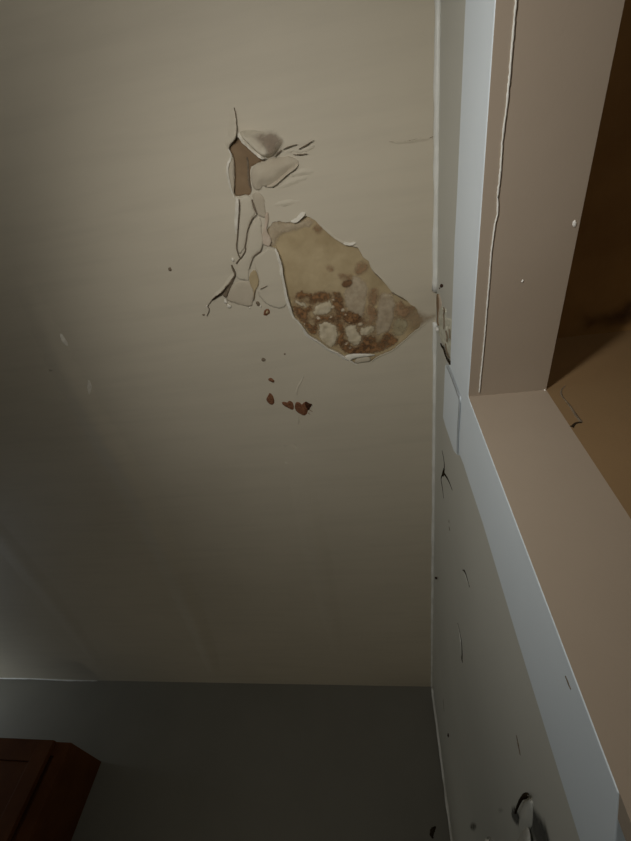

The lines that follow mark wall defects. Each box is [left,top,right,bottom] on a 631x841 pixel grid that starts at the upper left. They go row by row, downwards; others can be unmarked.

spalling [223,108,452,365]
corrosion [266,393,313,415]
crack [441,452,452,498]
peeling [511,792,549,841]